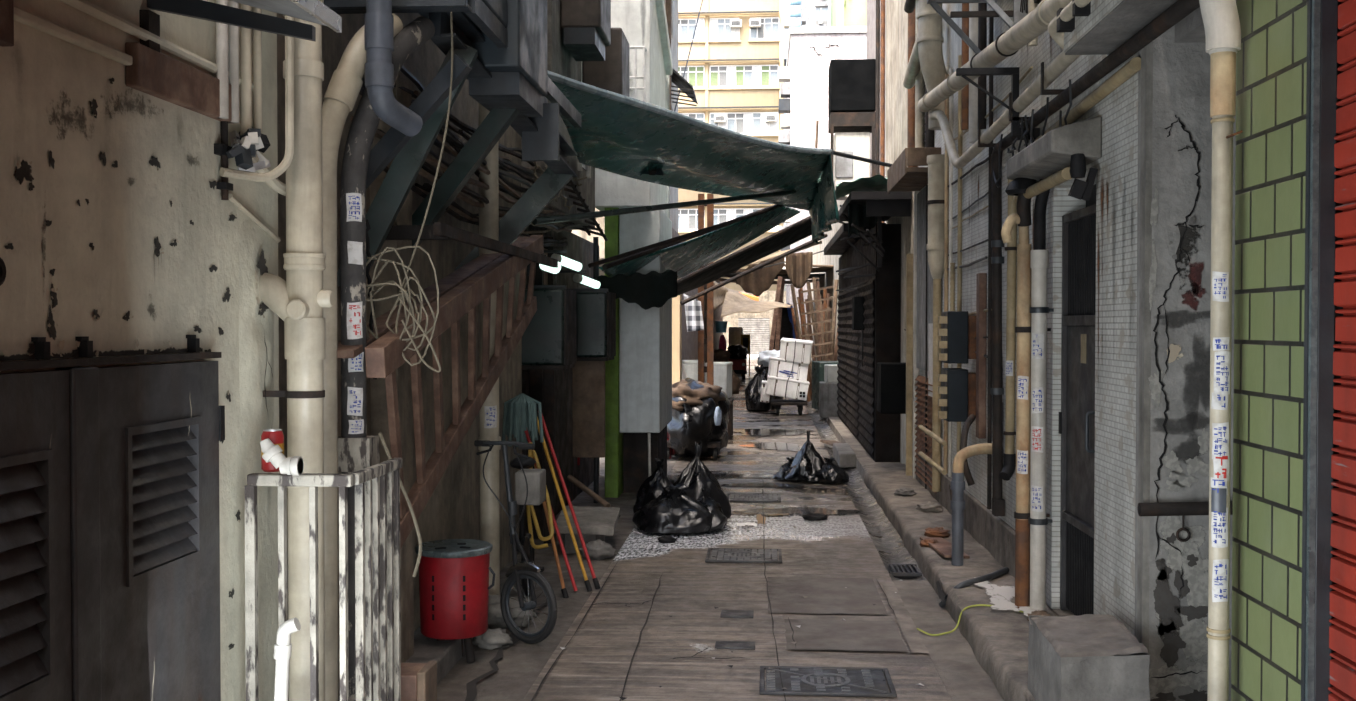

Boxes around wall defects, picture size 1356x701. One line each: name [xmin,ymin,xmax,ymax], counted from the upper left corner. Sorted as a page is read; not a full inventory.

spalling [14,157,35,191]
spalling [154,237,179,257]
peeling [0,269,211,361]
peeling [255,250,270,318]
crack [1153,115,1204,597]
crack [1151,670,1206,678]